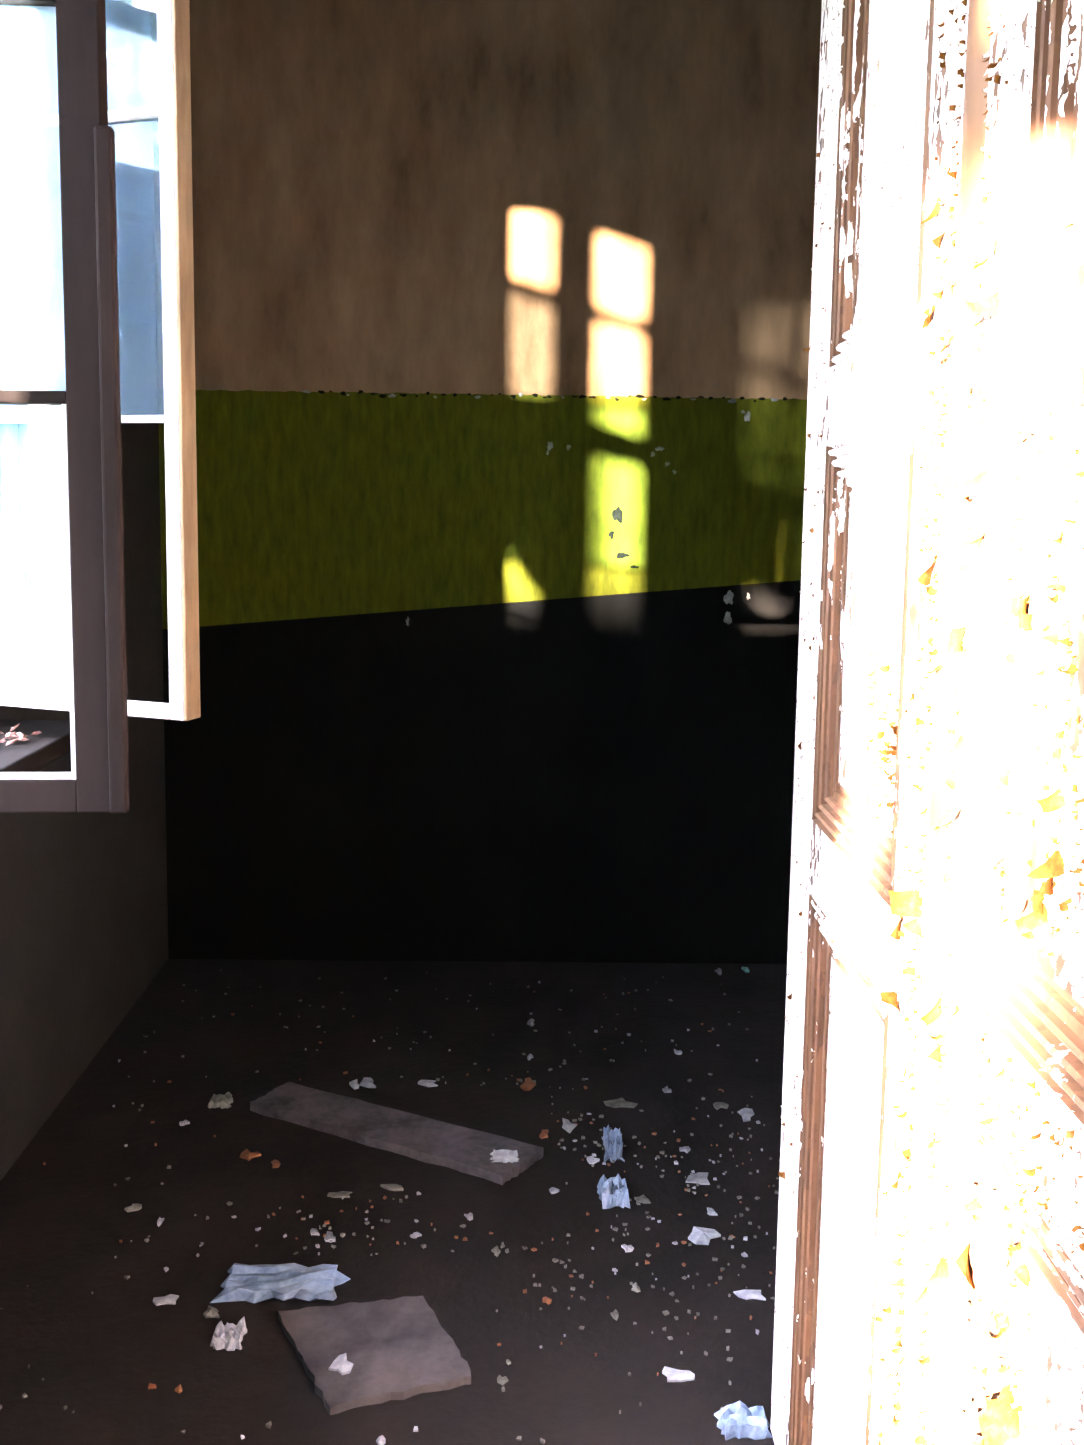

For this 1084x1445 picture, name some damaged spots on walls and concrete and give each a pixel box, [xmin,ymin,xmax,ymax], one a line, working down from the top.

peeling [799,433,823,598]
peeling [793,636,816,812]
peeling [862,0,1084,1445]